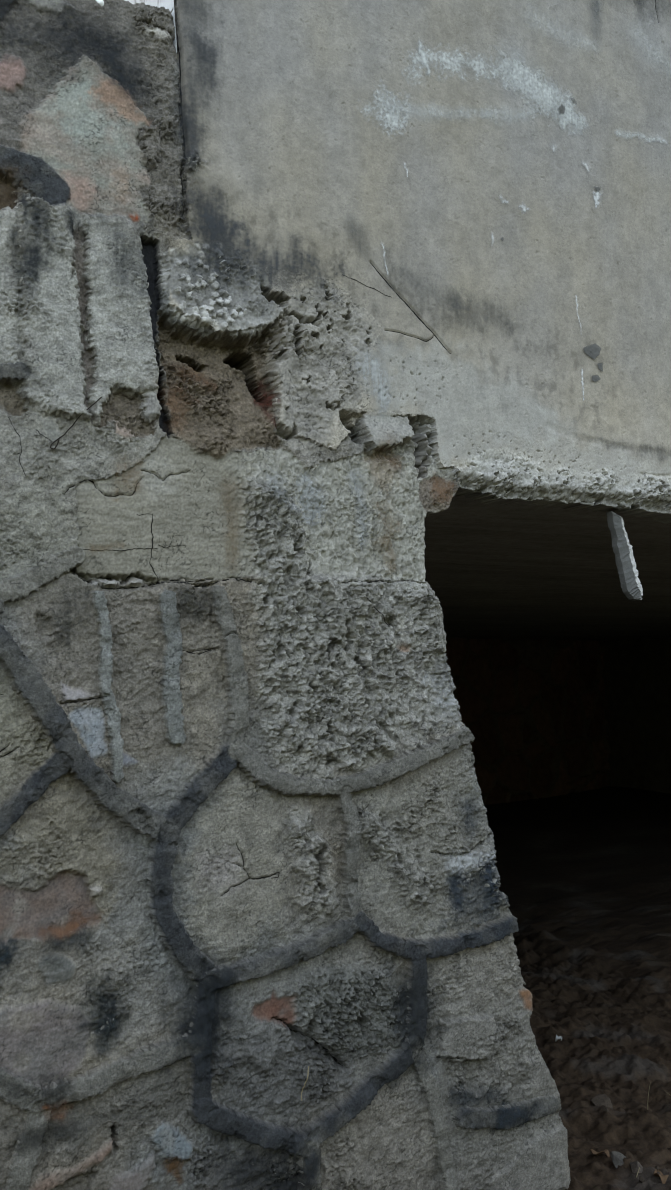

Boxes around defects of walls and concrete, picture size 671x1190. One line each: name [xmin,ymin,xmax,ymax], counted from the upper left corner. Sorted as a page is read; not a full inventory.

water stain [365,91,407,130]
water stain [412,41,584,129]
spalling [72,221,381,459]
spalling [408,414,671,525]
crack [224,843,276,894]